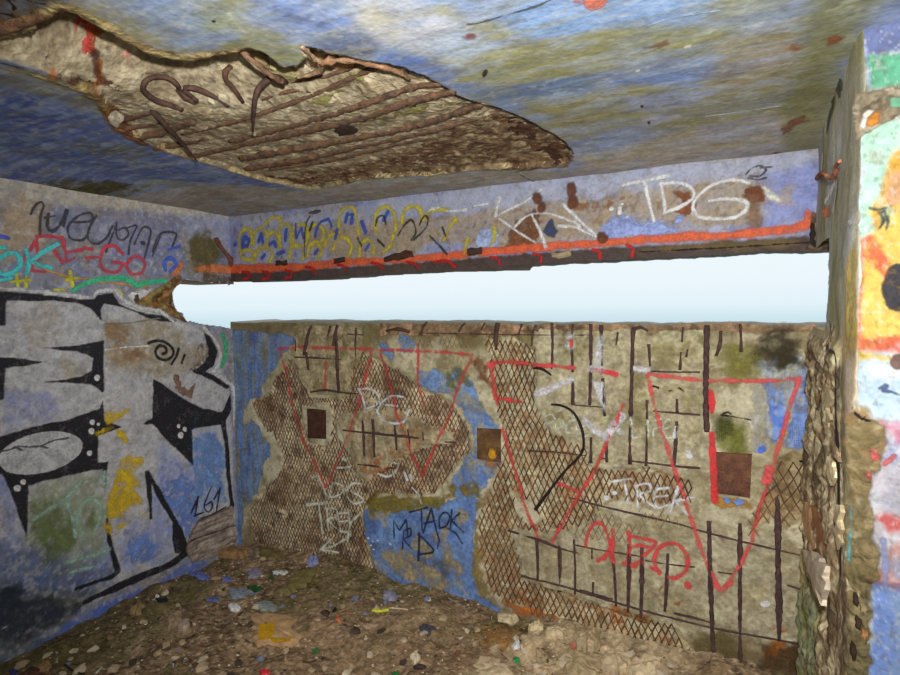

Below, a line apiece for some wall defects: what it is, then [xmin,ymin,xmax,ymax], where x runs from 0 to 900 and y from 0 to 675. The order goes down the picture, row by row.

spalling [0,9,573,190]
spalling [853,86,900,139]
spalling [128,276,187,322]
spalling [161,321,886,675]
peeling [126,533,158,563]